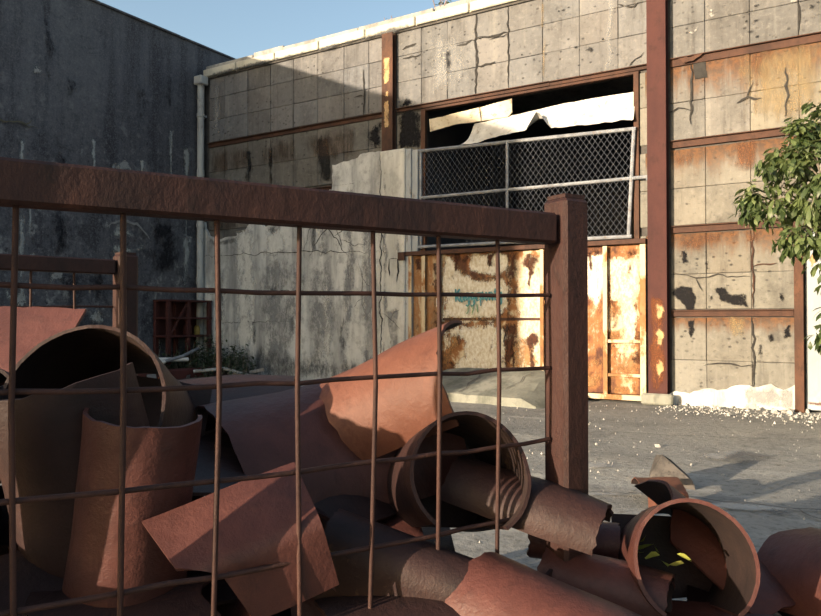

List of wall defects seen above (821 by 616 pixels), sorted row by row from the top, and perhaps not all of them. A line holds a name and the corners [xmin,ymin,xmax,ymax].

crack [737,83,761,103]
crack [783,68,791,116]
water stain [19,209,31,255]
water stain [153,222,191,272]
crack [206,228,400,353]
rust [454,253,538,367]
rust [609,300,640,374]
rust [650,297,665,387]